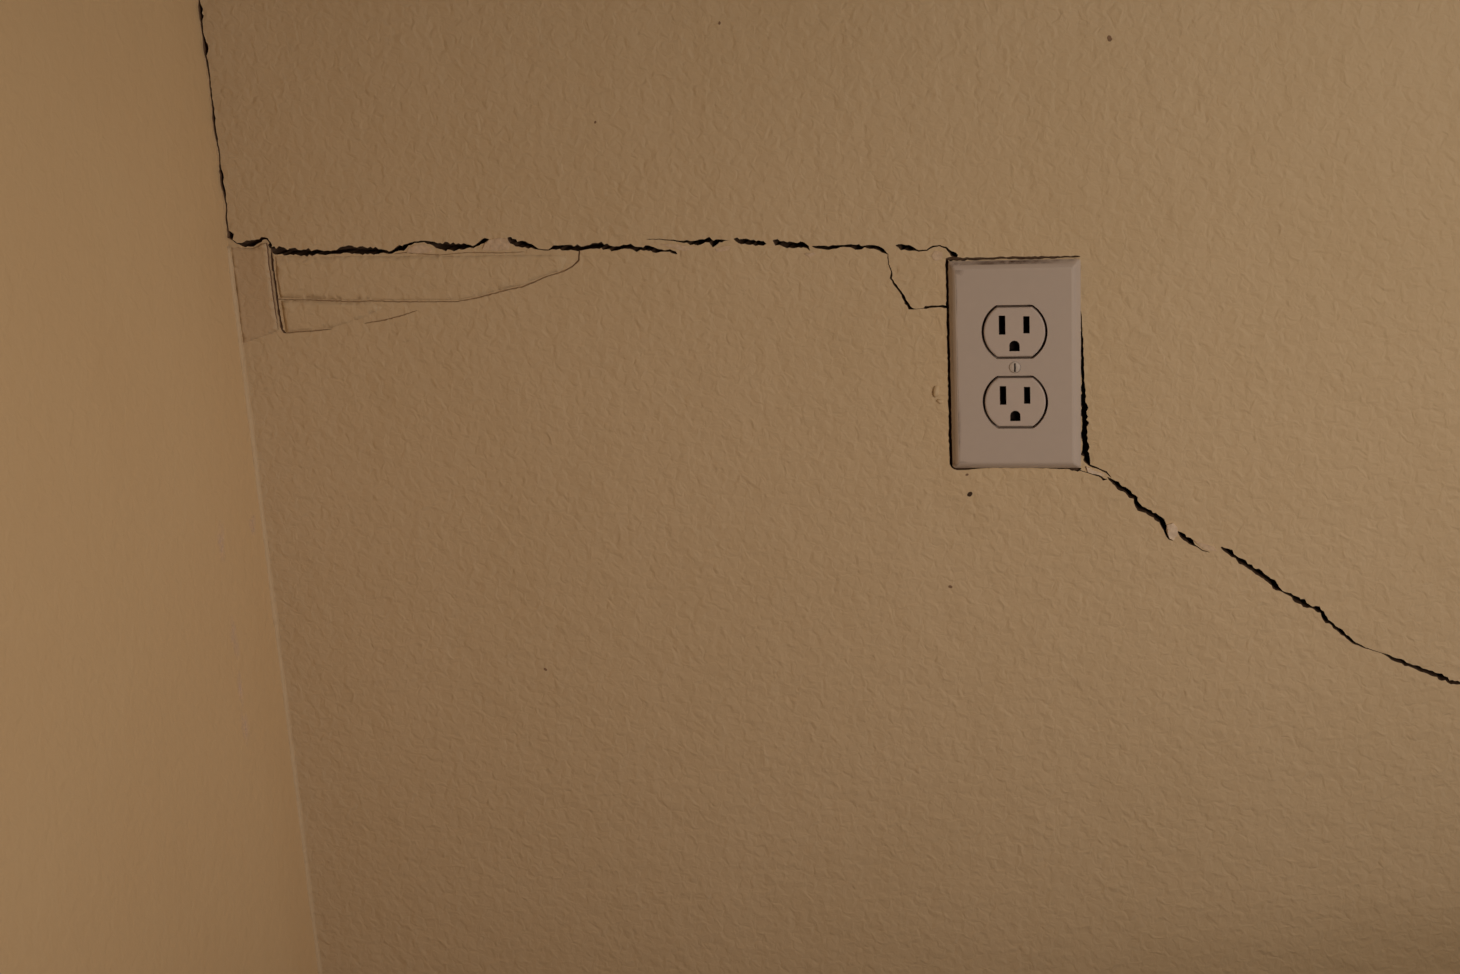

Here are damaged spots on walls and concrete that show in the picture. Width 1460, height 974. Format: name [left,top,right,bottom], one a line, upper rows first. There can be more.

crack [198,0,958,333]
crack [1079,314,1460,685]